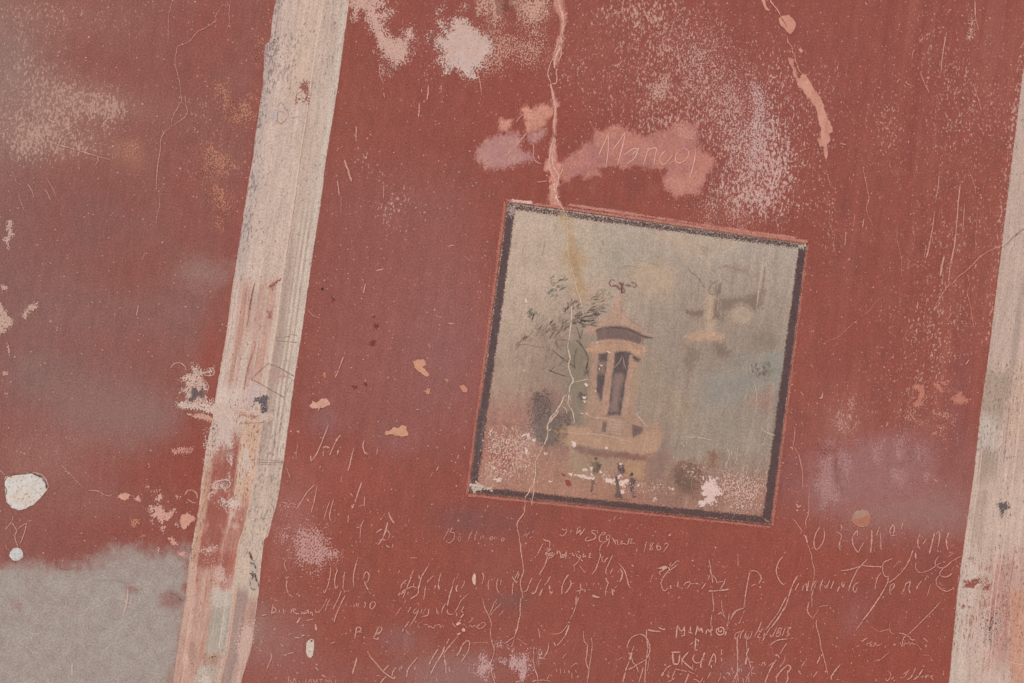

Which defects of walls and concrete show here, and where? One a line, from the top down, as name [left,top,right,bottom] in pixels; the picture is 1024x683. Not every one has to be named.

peeling [345,0,559,86]
peeling [559,2,799,228]
peeling [474,117,547,171]
crack [482,0,588,683]
peeling [309,398,330,409]
peeling [413,359,431,394]
peeling [385,425,408,437]
peeling [478,421,548,489]
flaking render [5,472,48,510]
peeling [568,457,766,514]
flaking render [9,548,23,561]